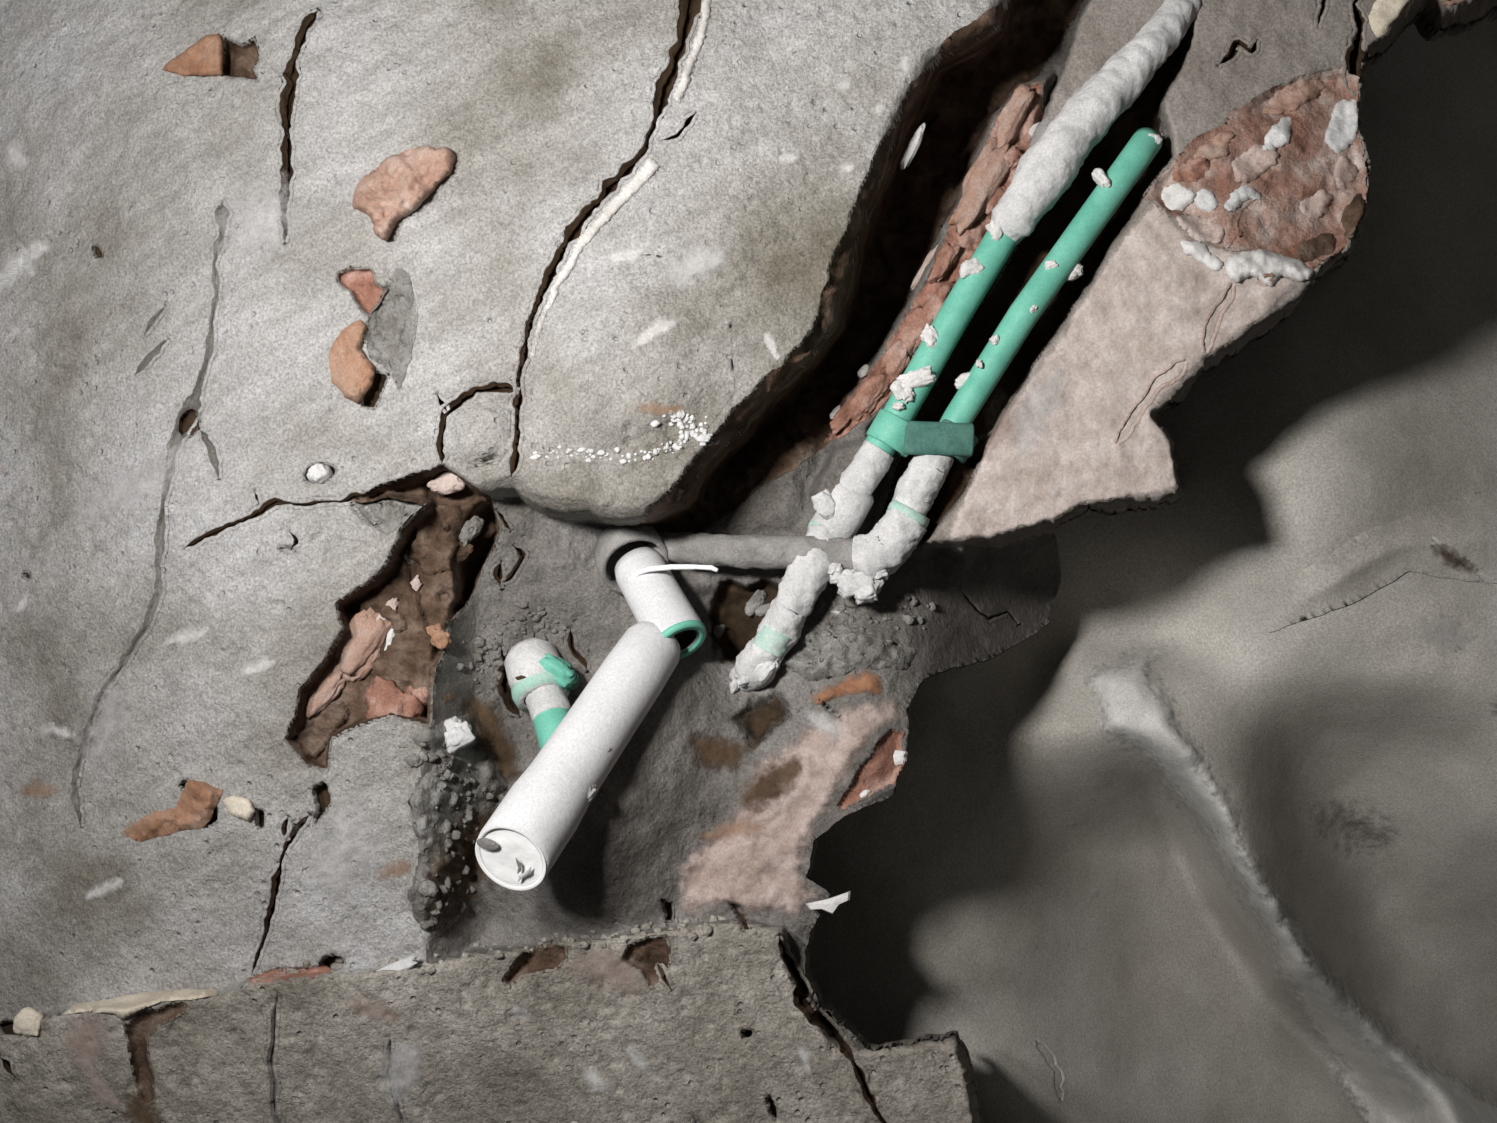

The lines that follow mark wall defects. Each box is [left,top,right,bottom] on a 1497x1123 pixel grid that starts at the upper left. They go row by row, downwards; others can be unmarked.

crack [68,0,711,828]
spalling [352,145,456,241]
spalling [639,0,1083,534]
peeling [949,67,1368,542]
crack [1216,36,1261,69]
crack [1314,0,1369,96]
peeling [1368,0,1478,38]
spalling [284,465,508,937]
peeling [621,622,919,989]
crack [0,1055,17,1079]
crack [249,812,312,1123]
crack [774,936,895,1123]